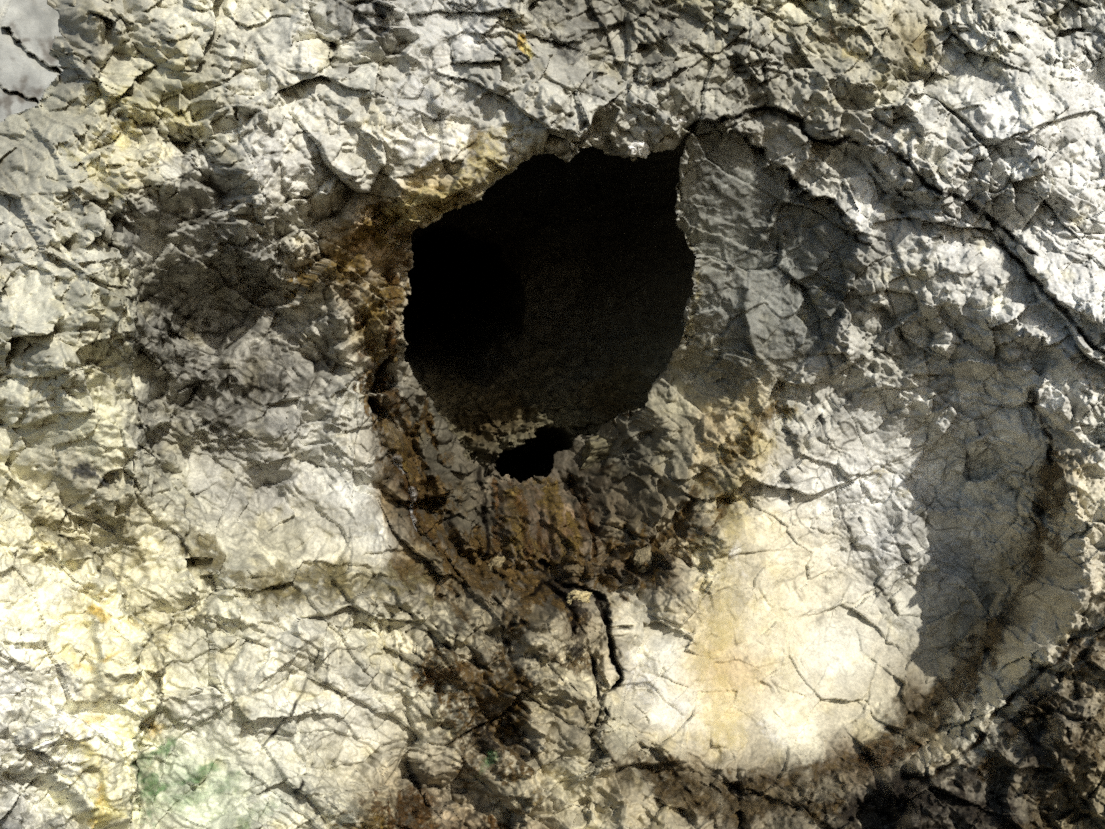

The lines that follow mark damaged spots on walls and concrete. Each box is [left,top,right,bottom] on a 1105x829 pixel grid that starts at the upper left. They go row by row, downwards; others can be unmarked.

crack [753,8,781,19]
peeling [397,133,438,167]
crack [680,107,1105,354]
crack [477,466,496,557]
water stain [353,369,797,673]
crack [567,461,620,555]
water stain [1047,533,1062,552]
crack [530,559,630,717]
water stain [411,645,534,787]
water stain [628,752,701,809]
water stain [860,708,951,770]